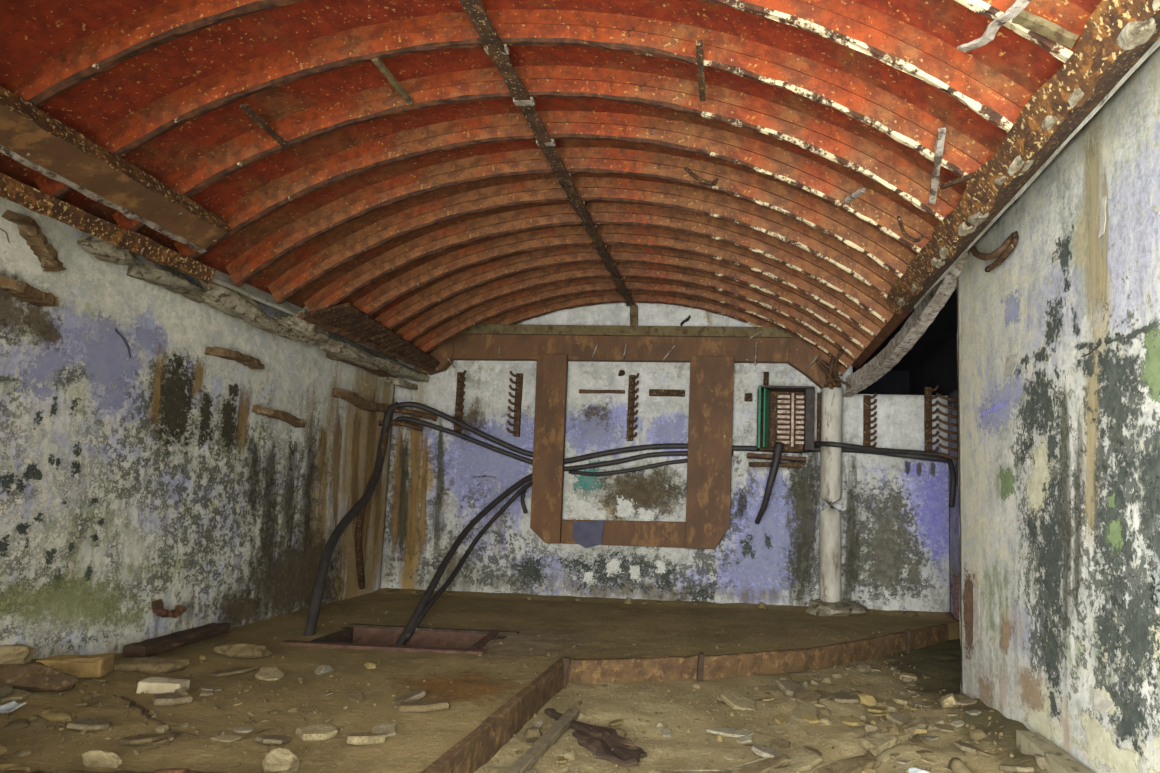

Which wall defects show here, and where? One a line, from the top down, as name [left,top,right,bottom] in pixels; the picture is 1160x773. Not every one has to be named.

water stain [1086,145,1108,315]
mould [0,513,45,563]
mould [0,442,82,493]
mould [33,396,82,429]
water stain [149,347,344,628]
rust [318,395,428,563]
water stain [434,402,486,543]
mould [510,547,718,603]
water stain [596,467,680,520]
water stain [734,530,772,567]
water stain [787,452,818,598]
water stain [1013,225,1160,757]